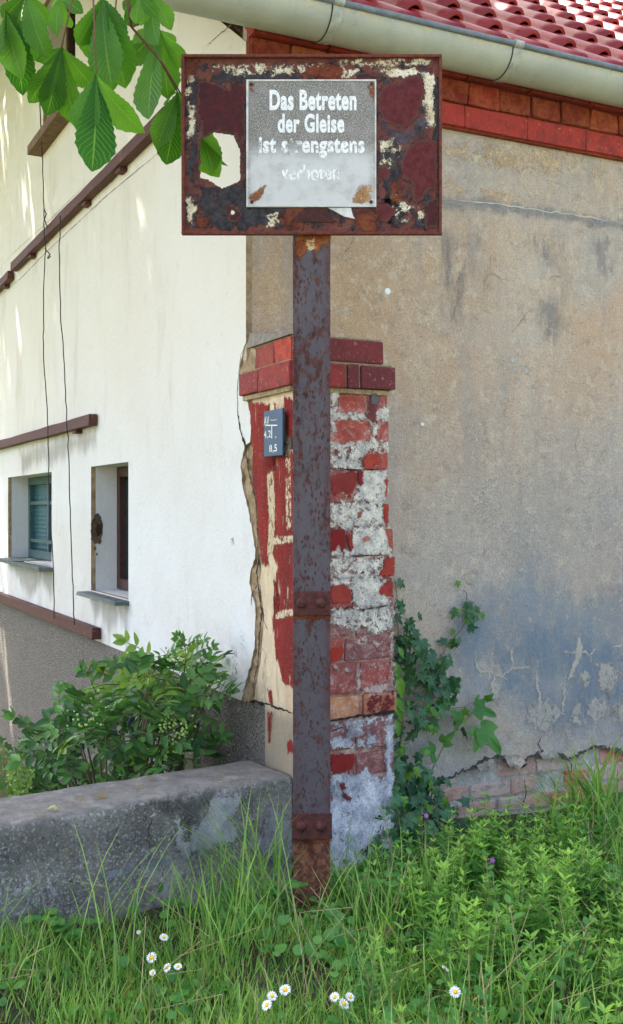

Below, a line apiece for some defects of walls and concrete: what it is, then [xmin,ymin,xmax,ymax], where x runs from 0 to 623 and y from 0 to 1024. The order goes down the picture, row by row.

crack [237,347,291,713]
peeling [241,396,293,743]
peeling [330,753,355,801]
peeling [330,393,397,717]
flaking render [429,637,623,819]